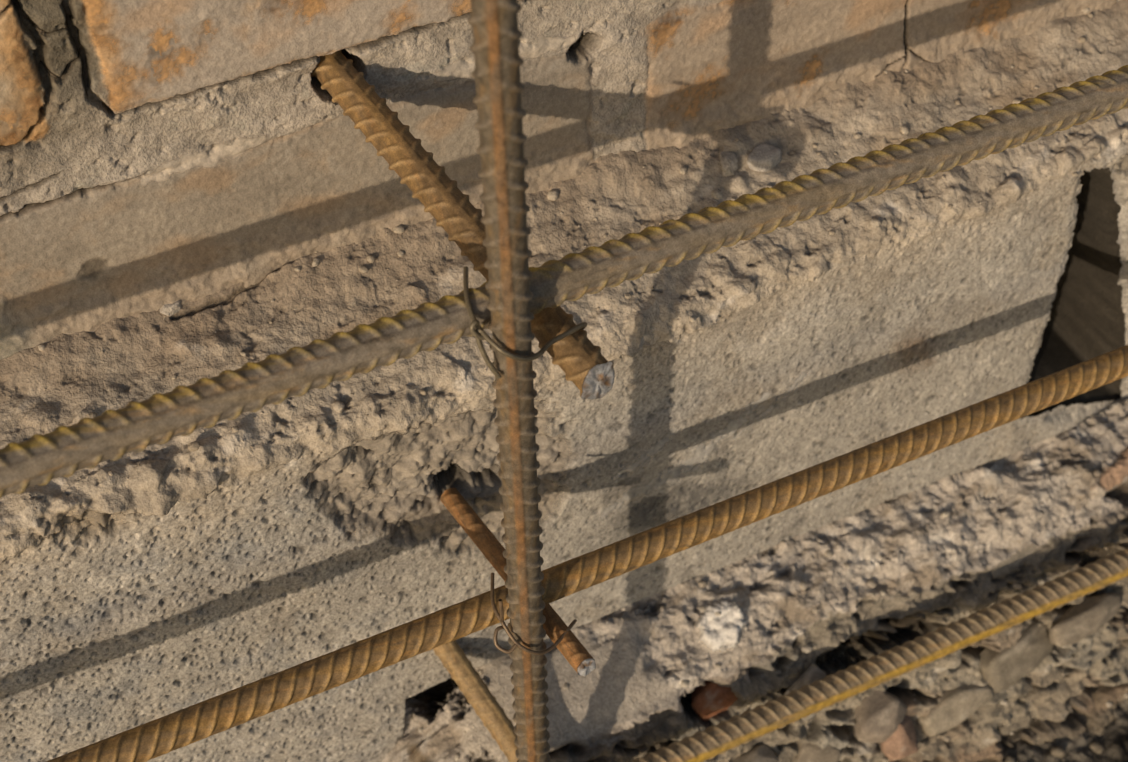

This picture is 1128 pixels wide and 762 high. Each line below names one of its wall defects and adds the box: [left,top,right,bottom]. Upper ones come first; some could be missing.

crack [876,2,925,76]
spalling [534,399,571,521]
spalling [305,407,505,551]
spalling [1104,483,1128,504]
spalling [57,510,112,532]
spalling [1075,546,1117,567]
spalling [884,616,930,641]
spalling [816,636,859,667]
spalling [680,692,693,714]